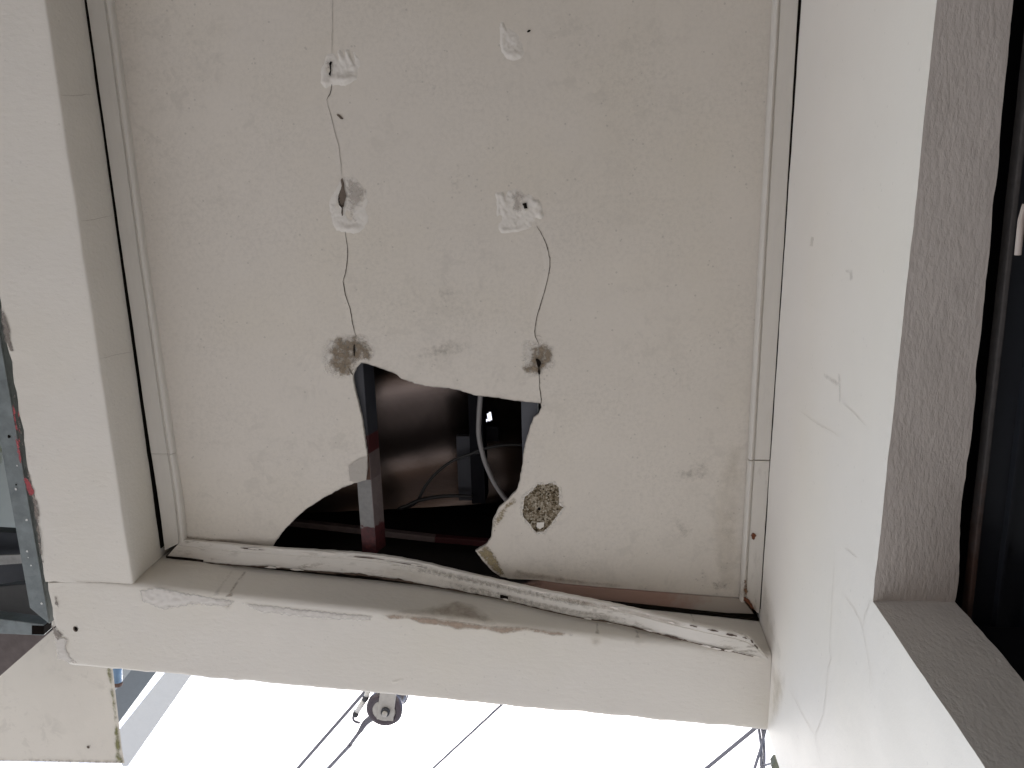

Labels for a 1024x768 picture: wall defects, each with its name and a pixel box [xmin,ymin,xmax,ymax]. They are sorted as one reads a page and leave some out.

crack [338,232,357,340]
crack [528,226,550,403]
spalling [189,336,759,658]
peeling [141,588,232,609]